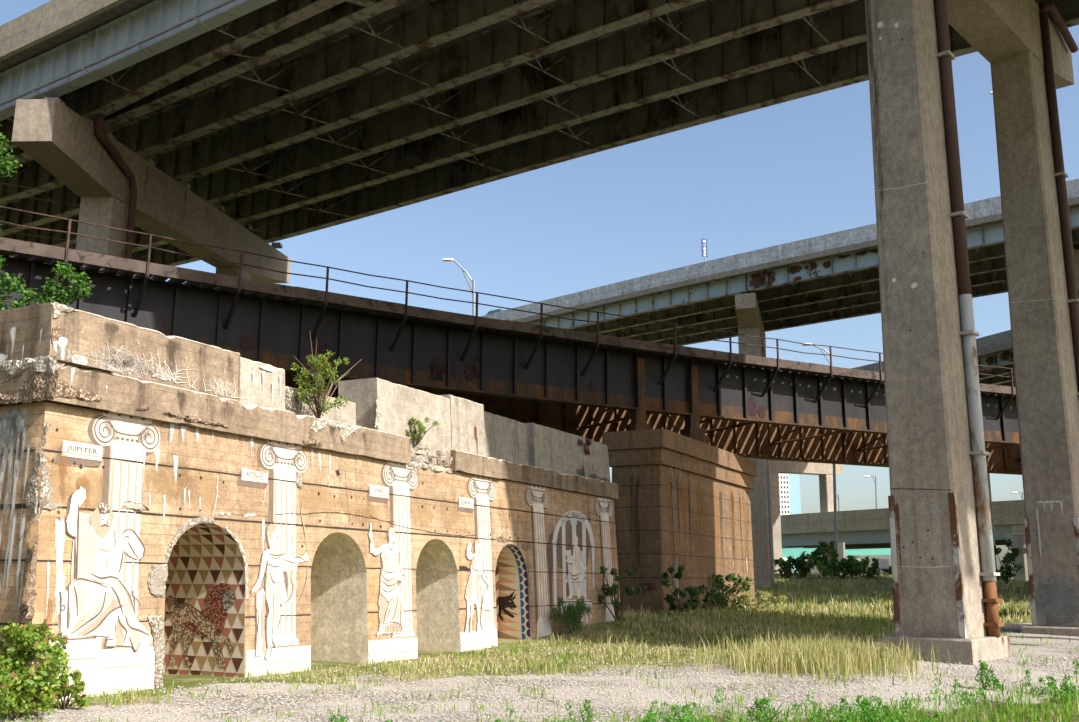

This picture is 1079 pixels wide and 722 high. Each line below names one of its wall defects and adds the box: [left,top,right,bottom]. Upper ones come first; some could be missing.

rust [749,271,776,289]
rust [789,248,878,281]
spalling [0,301,102,404]
spalling [407,441,458,474]
water stain [0,408,38,604]